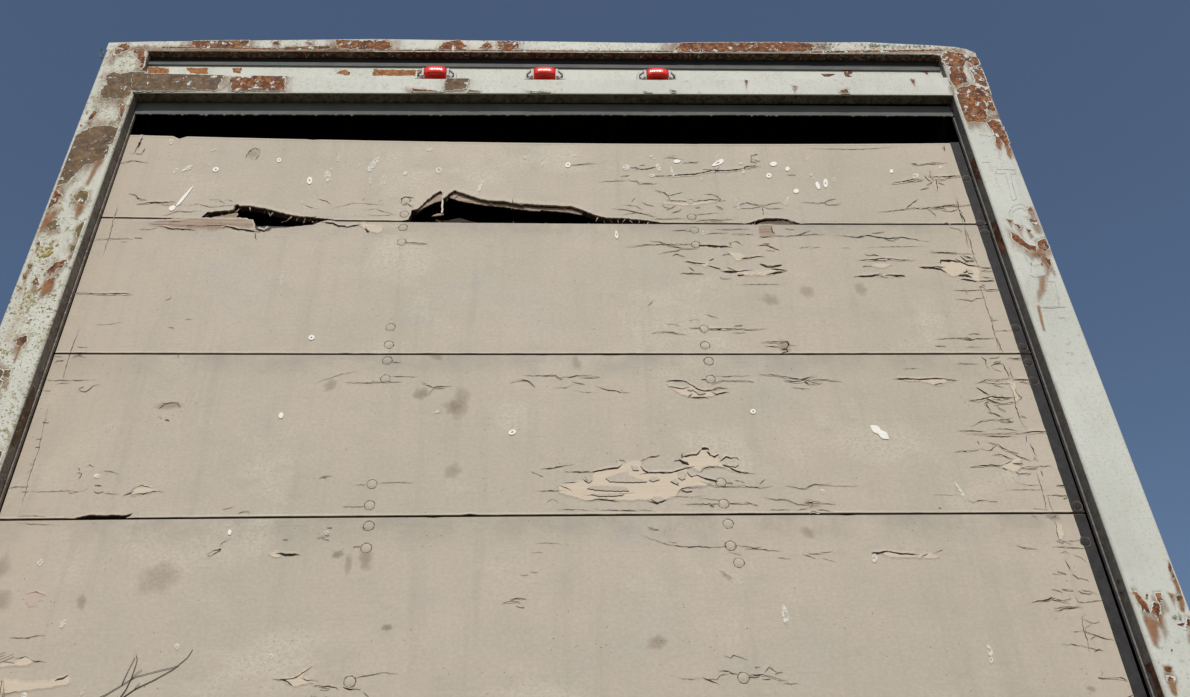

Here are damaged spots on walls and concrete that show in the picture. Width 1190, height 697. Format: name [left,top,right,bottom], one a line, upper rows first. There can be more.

rust [160,39,1011,157]
rust [23,42,288,296]
crack [306,194,413,216]
crack [404,238,425,246]
peeling [685,251,788,277]
peeling [921,252,982,282]
rust [991,206,1052,330]
crack [511,375,628,393]
peeling [665,378,726,399]
crack [561,145,1133,697]
peeling [546,445,755,504]
rust [1116,563,1190,644]